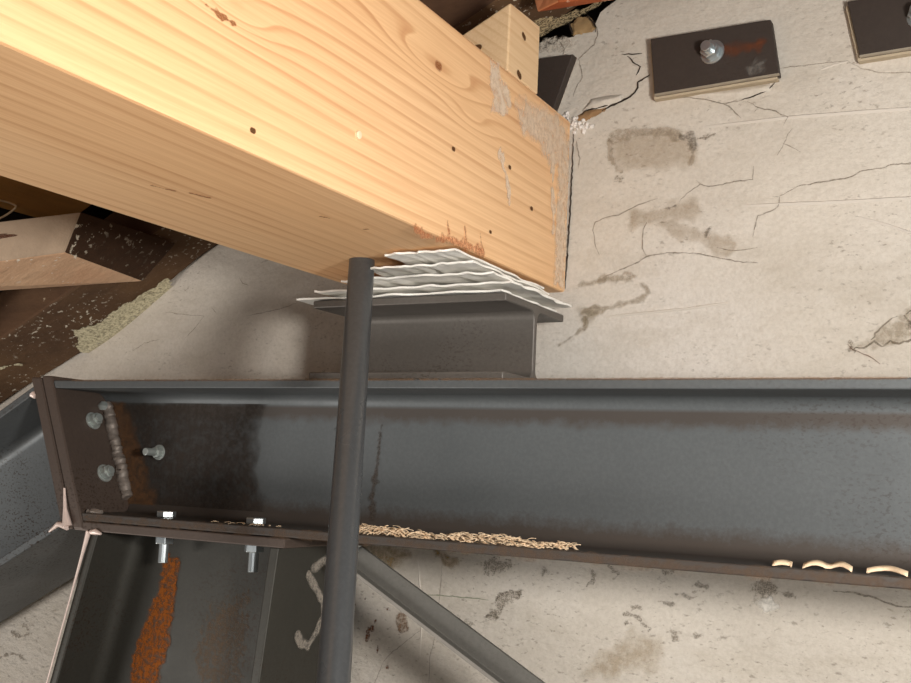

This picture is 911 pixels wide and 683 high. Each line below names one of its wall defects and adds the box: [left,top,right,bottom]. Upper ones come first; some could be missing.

crack [602,53,649,111]
crack [687,83,788,120]
crack [565,134,579,289]
corrosion [105,400,154,505]
corrosion [131,553,180,683]